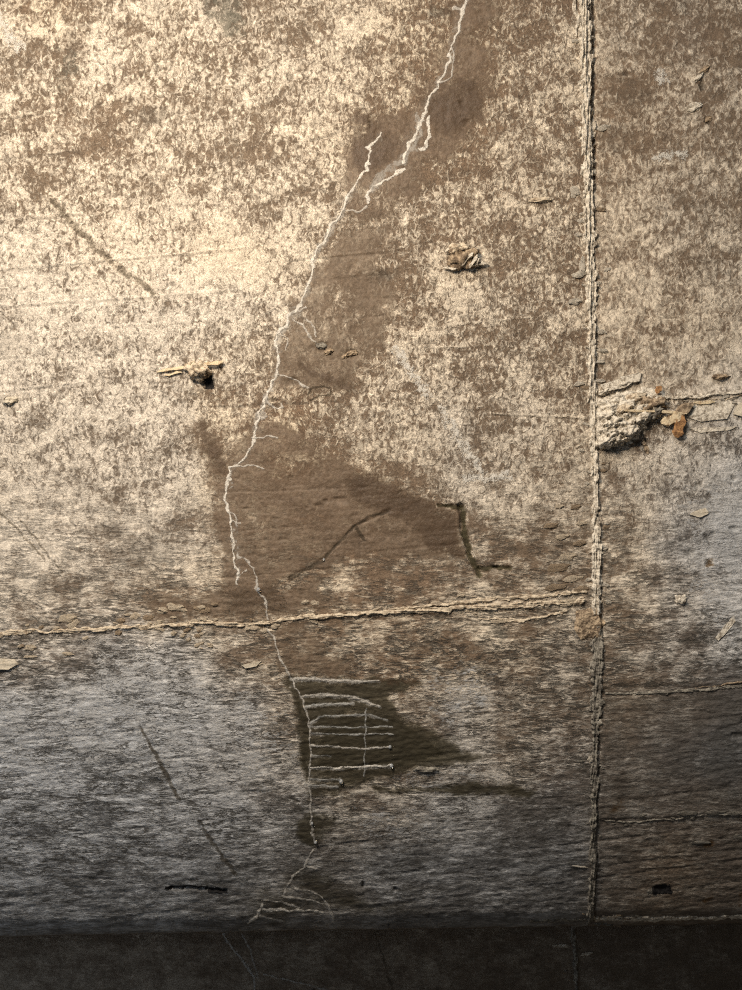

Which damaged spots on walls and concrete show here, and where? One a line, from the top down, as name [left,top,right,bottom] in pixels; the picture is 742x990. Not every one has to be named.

crack [223,0,467,841]
water stain [391,345,513,484]
spalling [595,373,742,454]
water stain [151,595,193,621]
water stain [194,421,532,797]